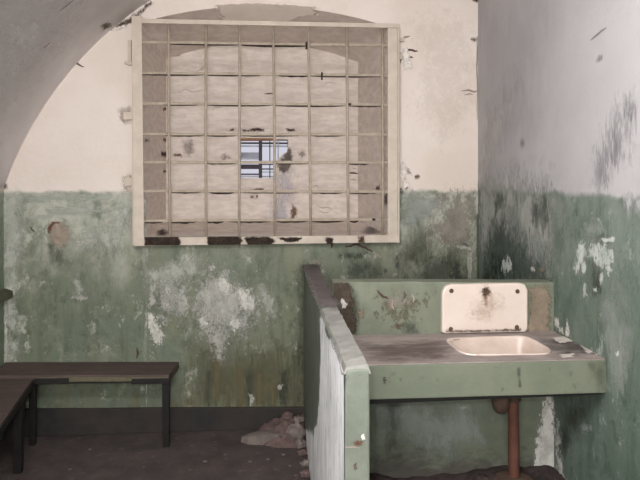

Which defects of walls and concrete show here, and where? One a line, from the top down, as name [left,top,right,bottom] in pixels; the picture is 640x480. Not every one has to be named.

peeling [48,206,132,258]
damp [425,254,459,279]
damp [476,195,543,279]
peeling [573,221,615,298]
peeling [141,256,275,373]
flaking render [333,282,357,334]
peeling [533,397,567,479]